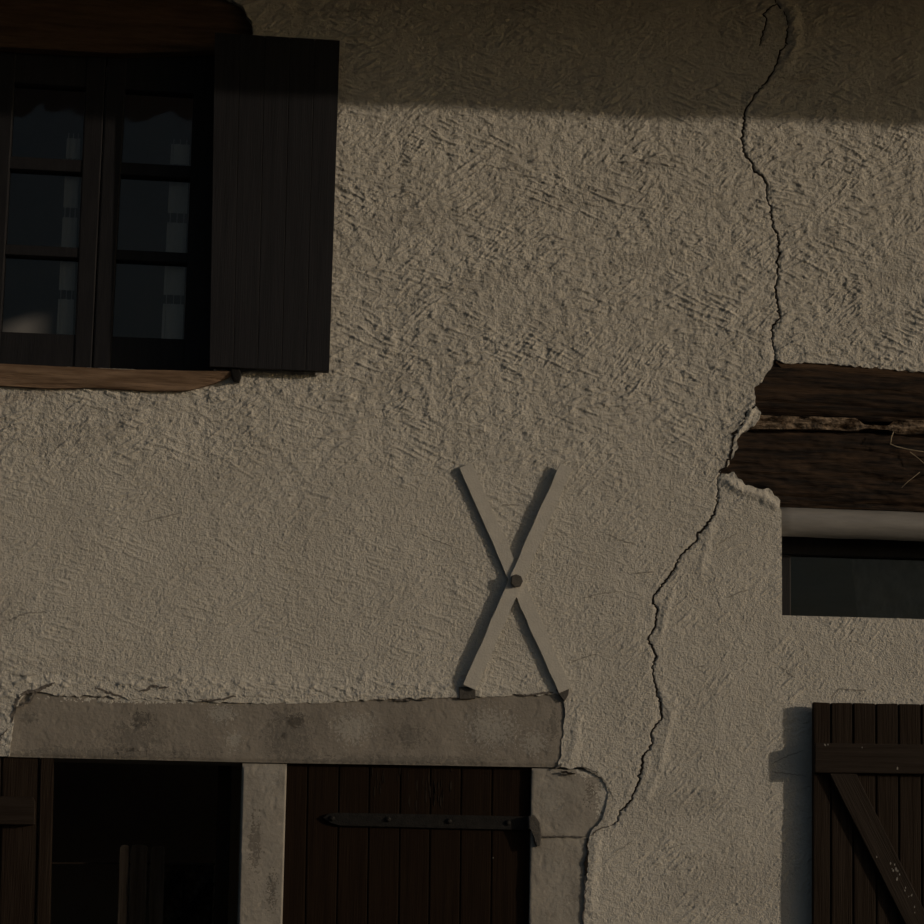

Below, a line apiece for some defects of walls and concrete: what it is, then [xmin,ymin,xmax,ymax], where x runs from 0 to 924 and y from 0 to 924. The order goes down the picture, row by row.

crack [740,0,789,362]
crack [0,682,55,746]
crack [95,684,168,697]
crack [199,694,236,702]
crack [541,404,756,923]